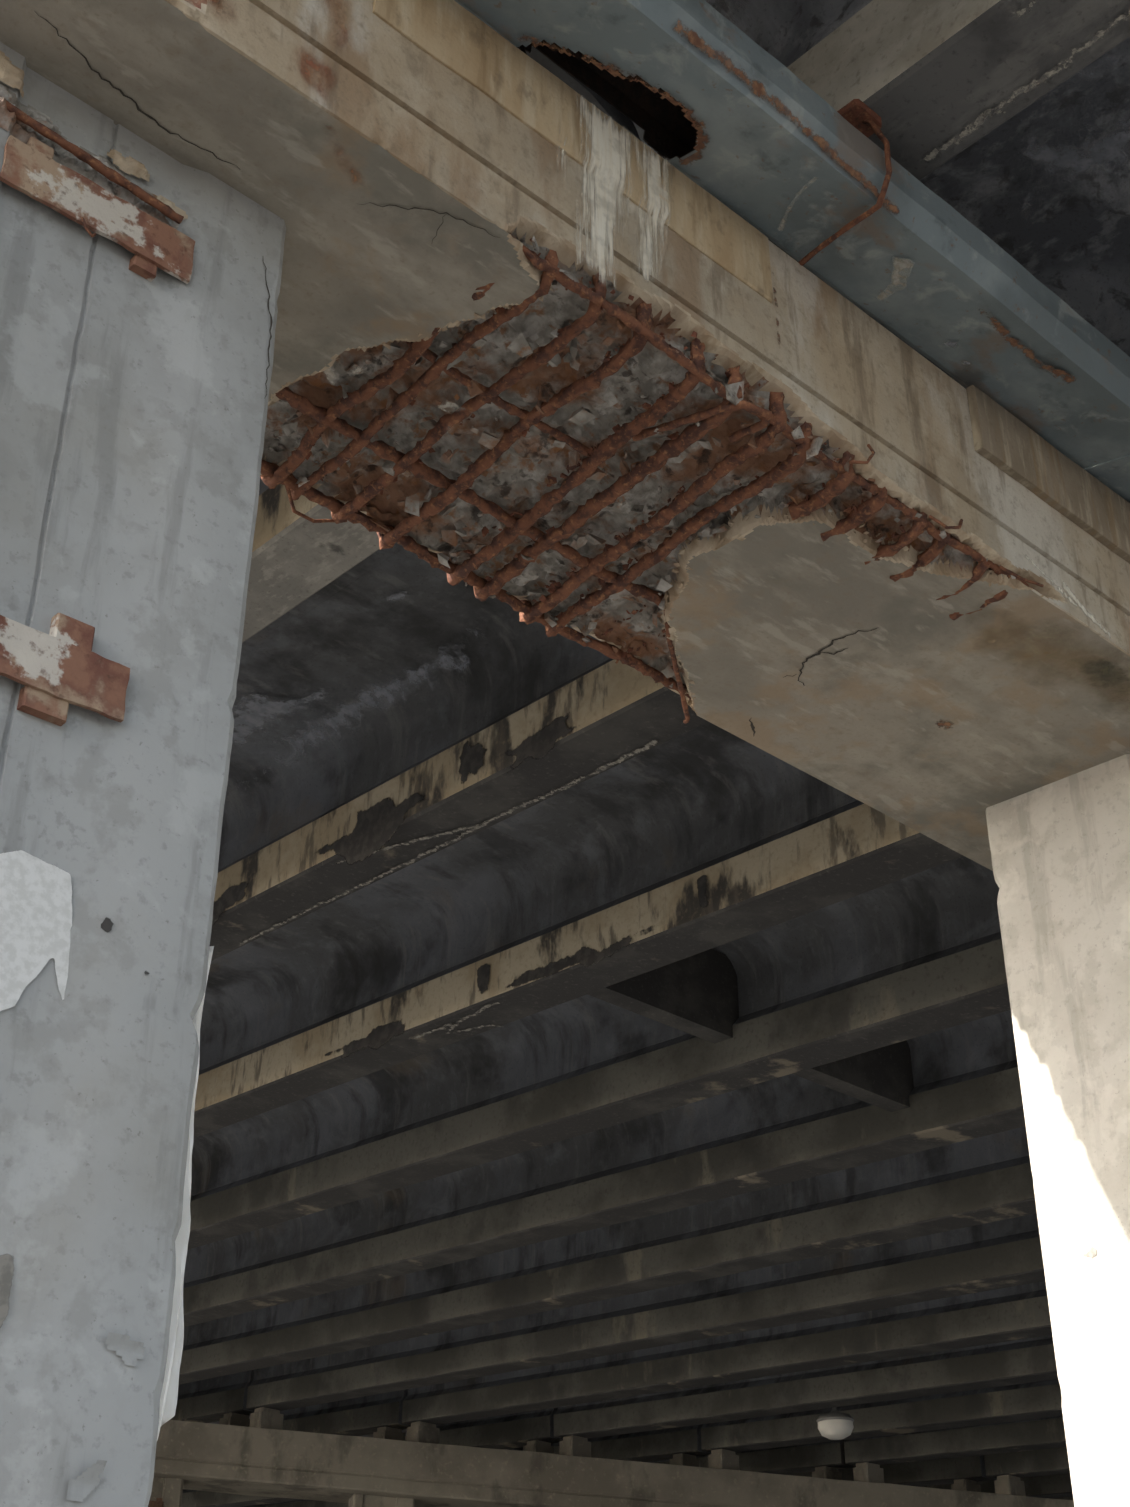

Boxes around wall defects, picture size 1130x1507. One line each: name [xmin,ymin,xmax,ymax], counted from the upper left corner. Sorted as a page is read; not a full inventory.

crack [37,14,234,165]
damp [578,98,670,282]
rust [674,20,899,214]
spalling [260,215,1068,724]
crack [785,628,877,686]
peeling [0,850,73,1011]